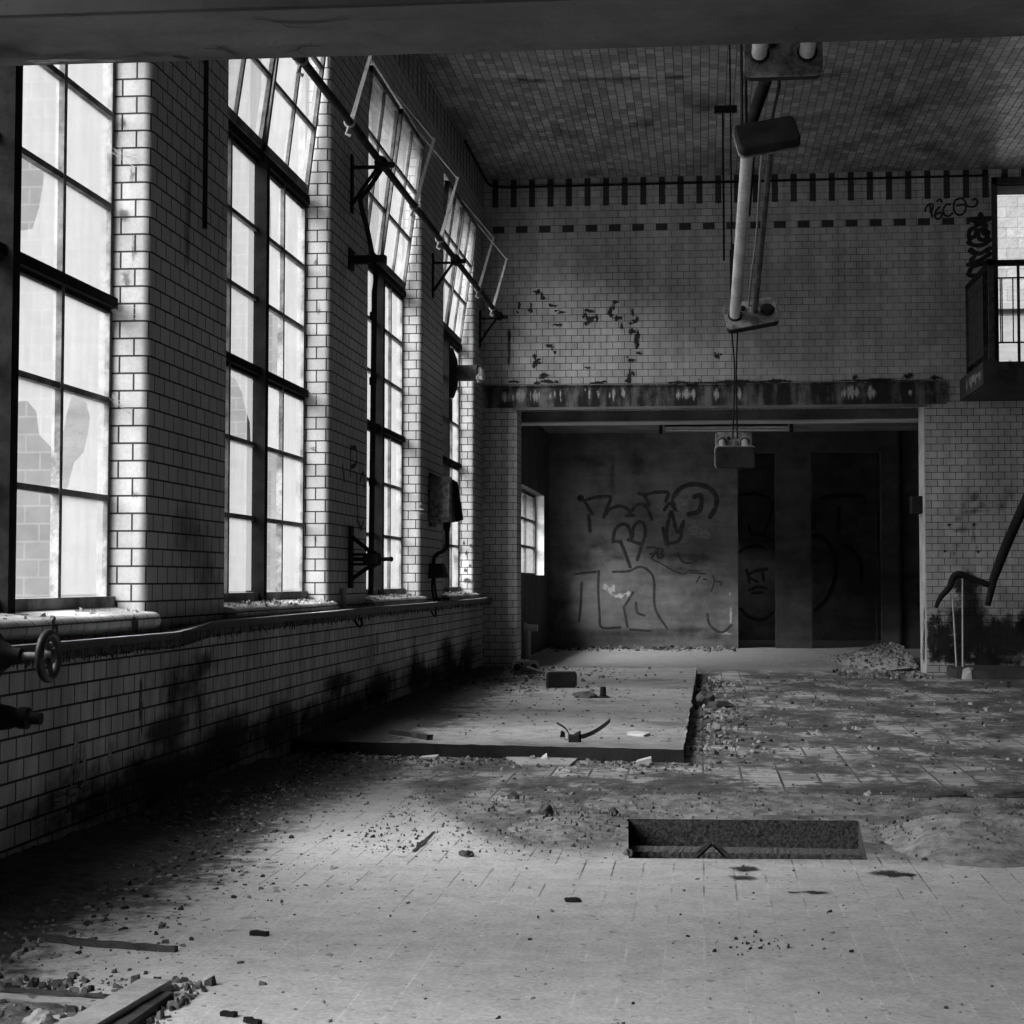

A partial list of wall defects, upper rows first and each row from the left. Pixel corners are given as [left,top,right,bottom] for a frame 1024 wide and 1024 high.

spalling [516,289,566,327]
spalling [582,301,642,383]
spalling [532,344,559,385]
leakage [502,389,561,402]